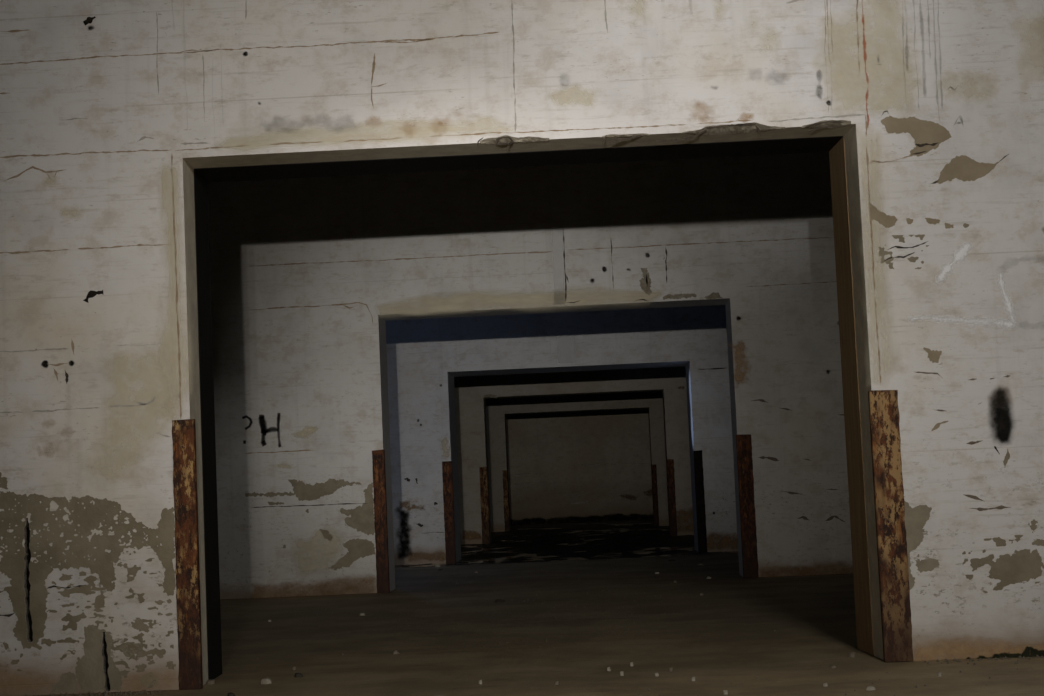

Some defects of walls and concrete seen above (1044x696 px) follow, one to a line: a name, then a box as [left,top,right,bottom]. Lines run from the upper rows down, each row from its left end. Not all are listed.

peeling [881,116,951,157]
peeling [937,155,999,184]
peeling [869,202,969,269]
peeling [0,472,176,693]
peeling [245,478,375,570]
peeling [904,500,940,590]
peeling [962,520,1044,593]